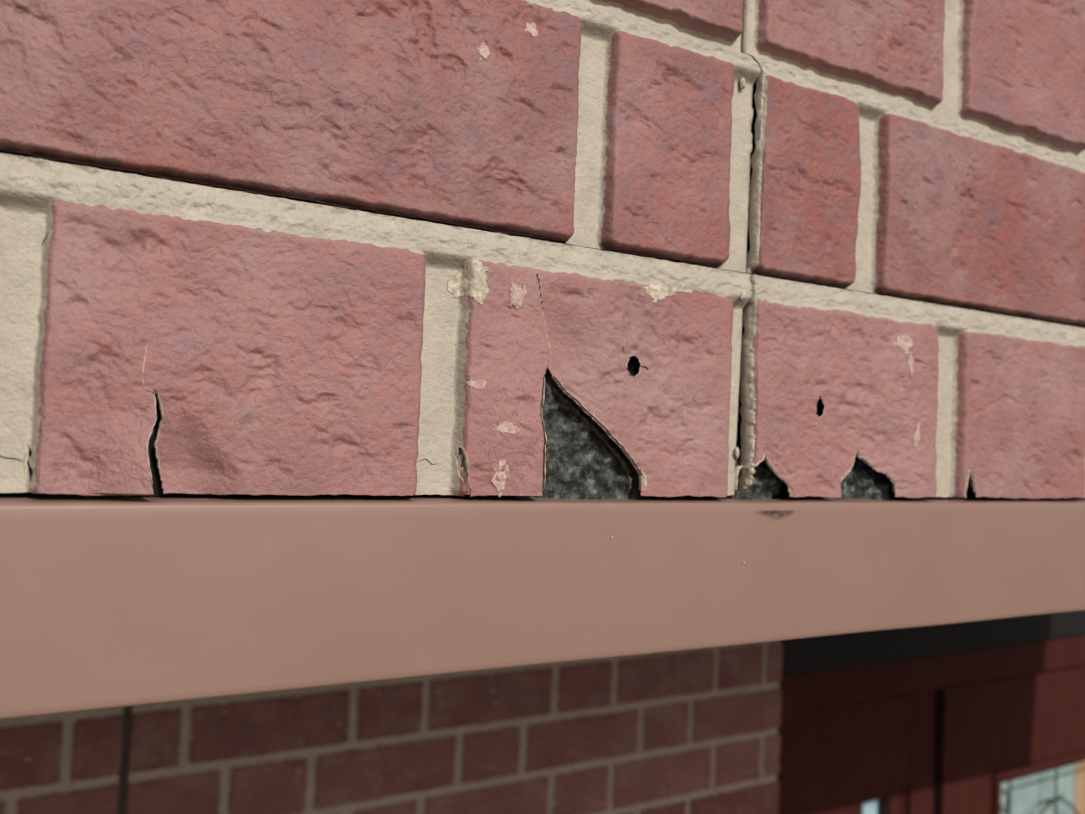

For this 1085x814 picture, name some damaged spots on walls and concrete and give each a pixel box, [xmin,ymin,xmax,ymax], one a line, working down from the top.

peeling [448,255,489,304]
peeling [509,282,527,309]
spalling [623,339,640,377]
peeling [459,378,487,389]
crack [119,341,179,497]
peeling [492,421,523,434]
spalling [516,368,647,500]
crack [734,341,756,489]
peeling [491,458,509,497]
spalling [731,453,794,500]
spalling [819,450,897,500]